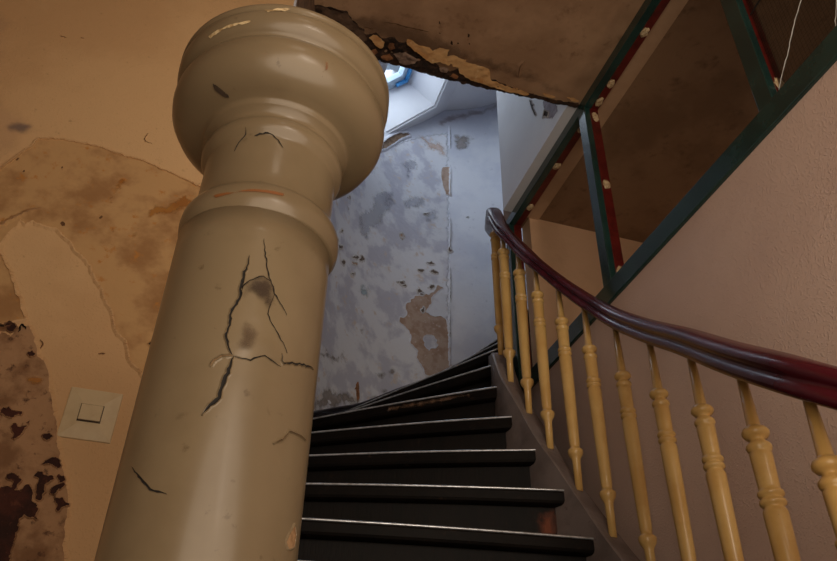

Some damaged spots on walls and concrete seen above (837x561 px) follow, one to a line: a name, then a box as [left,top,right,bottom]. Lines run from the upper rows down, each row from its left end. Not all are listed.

flaking render [315,5,579,119]
peeling [0,137,201,561]
crack [200,243,314,416]
peeling [314,131,454,411]
crack [132,467,166,494]